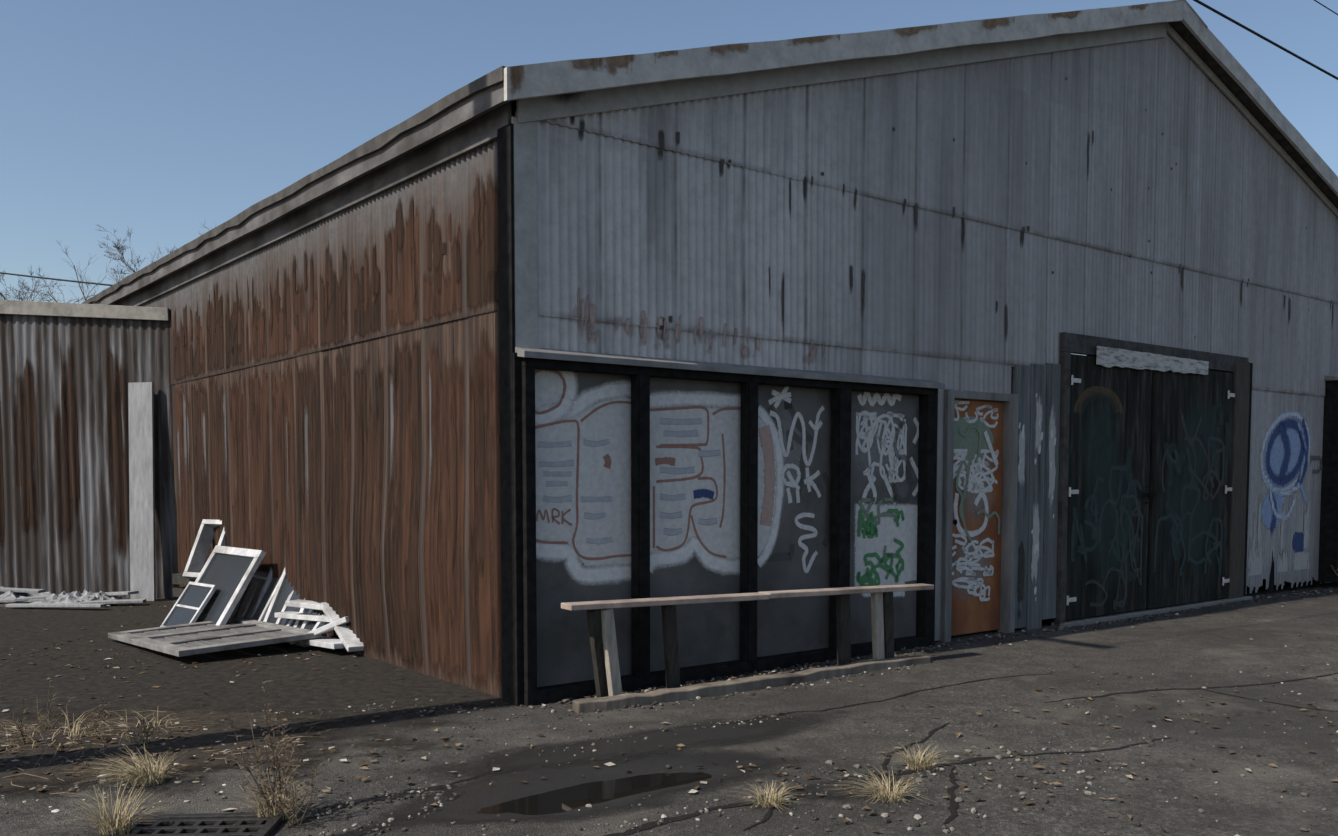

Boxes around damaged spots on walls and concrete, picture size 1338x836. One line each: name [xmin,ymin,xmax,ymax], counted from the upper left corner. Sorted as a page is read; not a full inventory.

rust [1049,10,1081,18]
rust [984,17,1009,28]
rust [896,25,937,35]
rust [793,34,840,44]
rust [711,43,748,54]
rust [573,54,634,73]
rust [511,65,524,92]